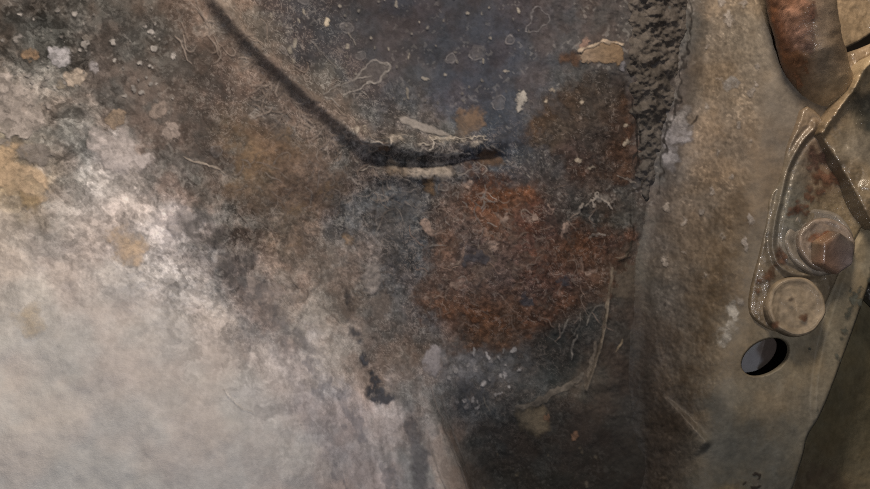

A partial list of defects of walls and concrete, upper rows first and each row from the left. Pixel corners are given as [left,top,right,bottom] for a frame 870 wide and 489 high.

peeling [578,39,625,71]
crack [674,19,698,122]
crack [627,99,668,195]
corrosion [416,180,638,351]